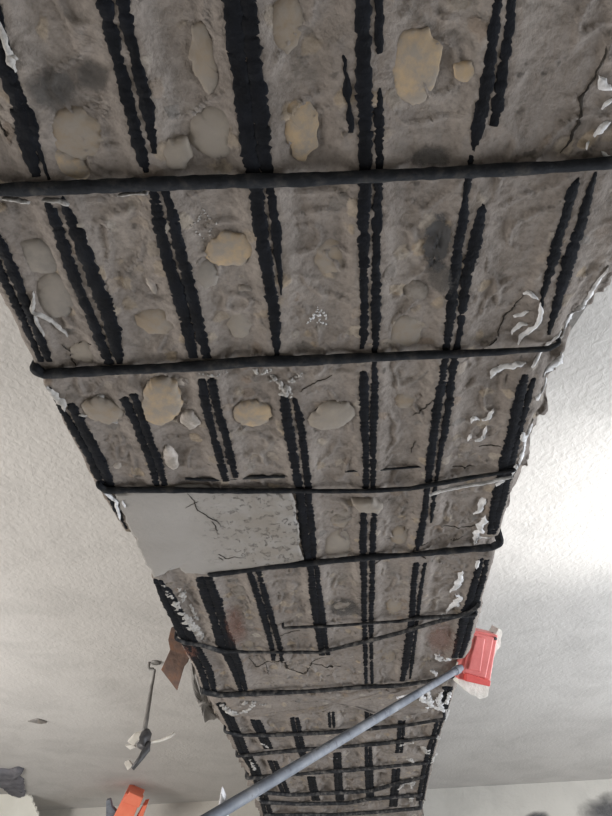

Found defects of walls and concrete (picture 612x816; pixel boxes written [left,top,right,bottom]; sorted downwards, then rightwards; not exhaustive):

spalling [0,0,612,183]
crack [560,48,606,153]
crack [483,295,524,349]
crack [186,496,221,534]
spalling [0,169,612,816]
crack [249,657,340,674]